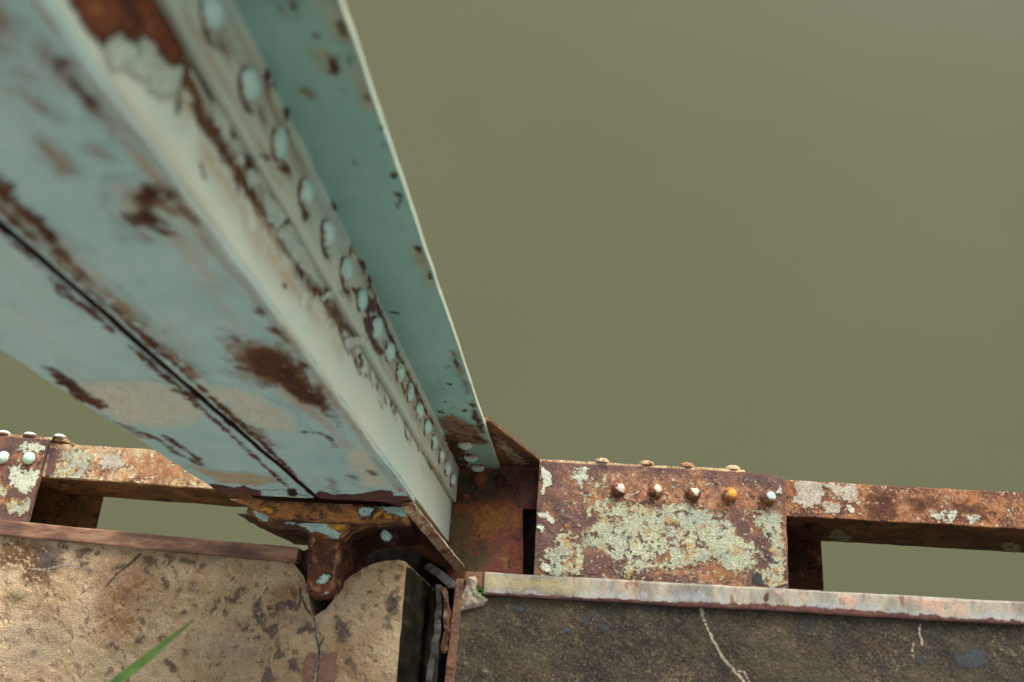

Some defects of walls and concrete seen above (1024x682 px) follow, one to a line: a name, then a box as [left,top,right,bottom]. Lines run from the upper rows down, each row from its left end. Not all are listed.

spalling [68,0,184,115]
rust [0,0,411,514]
peeling [212,99,393,361]
rust [169,0,491,480]
peeling [175,184,402,490]
peeling [70,378,310,433]
peeling [0,441,129,517]
rust [555,525,577,576]
rust [555,465,785,522]
rust [851,488,1024,524]
crack [299,588,337,682]
crack [699,608,750,682]